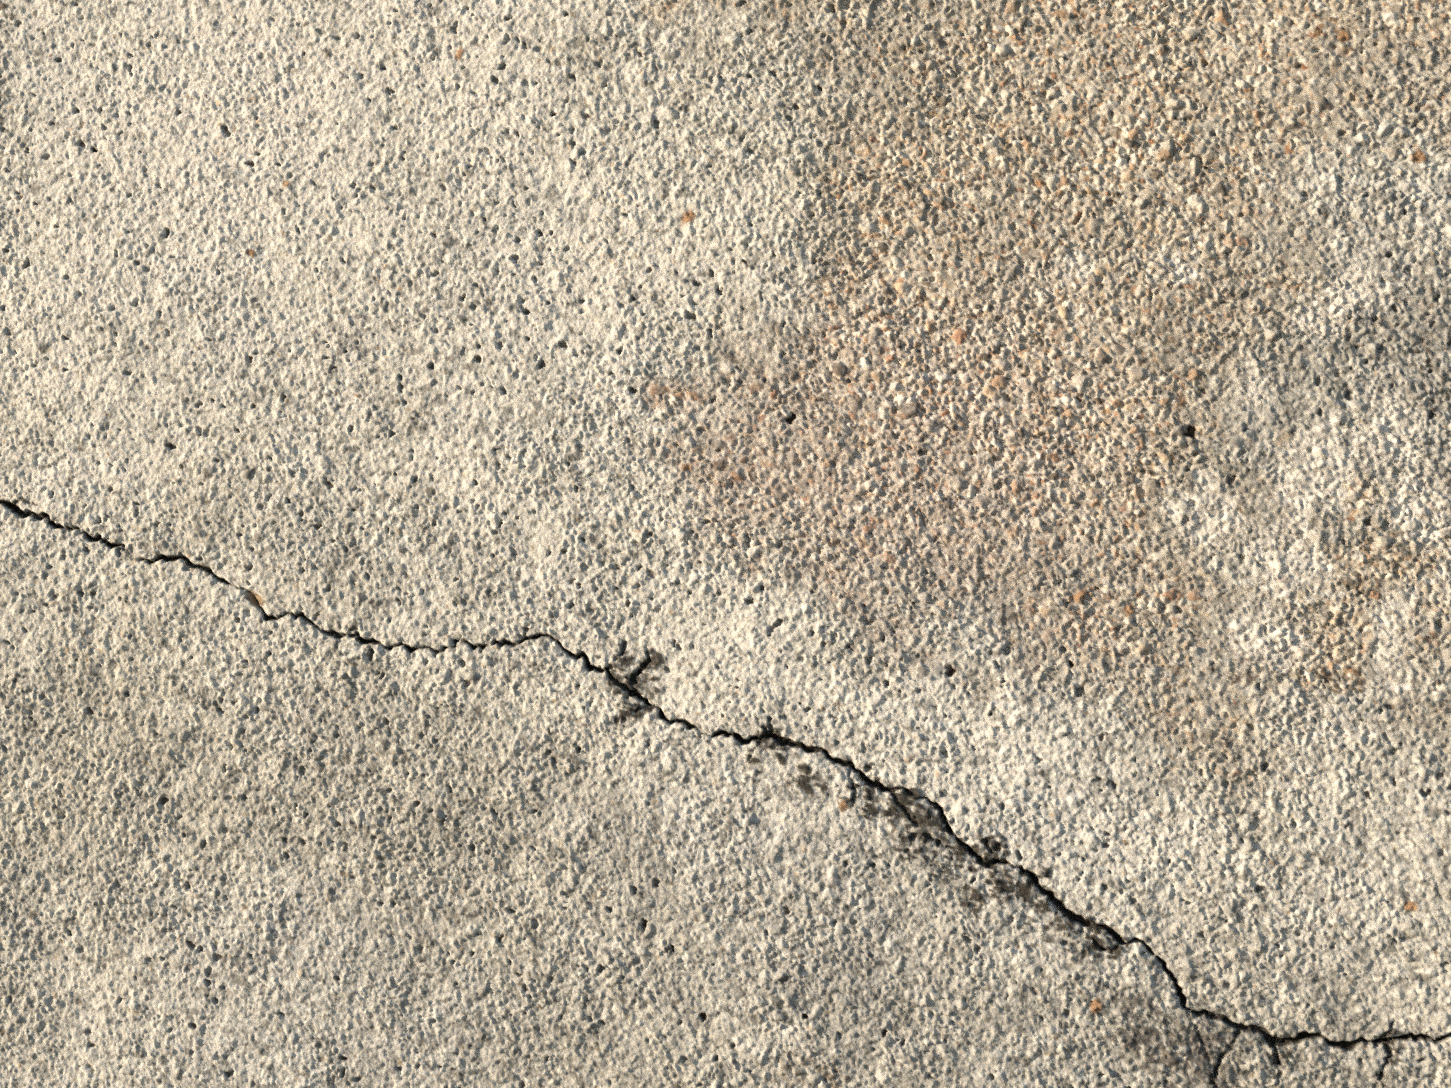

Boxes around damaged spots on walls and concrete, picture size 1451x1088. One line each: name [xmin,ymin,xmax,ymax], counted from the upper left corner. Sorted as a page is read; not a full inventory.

crack [0,498,1451,1084]